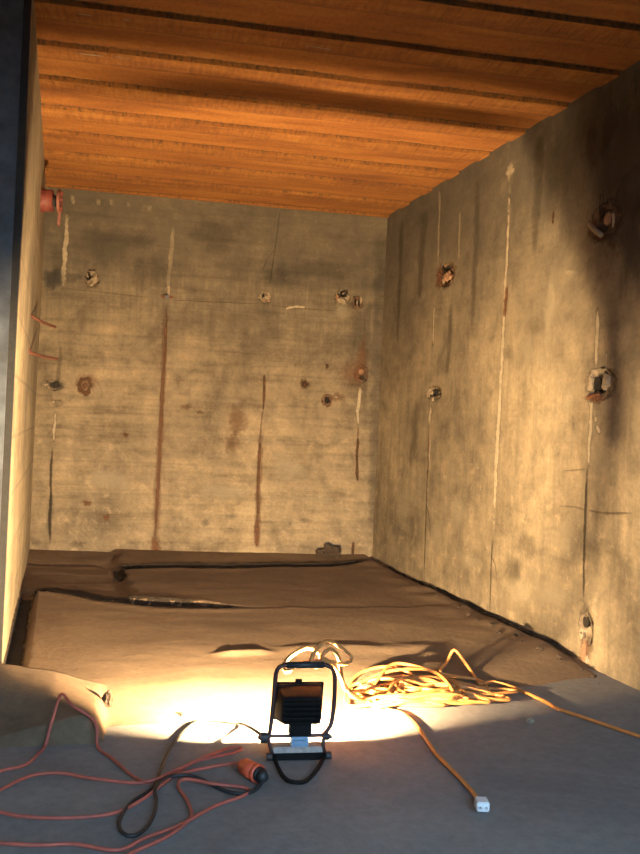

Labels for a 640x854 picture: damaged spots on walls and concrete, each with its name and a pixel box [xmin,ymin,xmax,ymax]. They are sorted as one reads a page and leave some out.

spalling [587,194,622,241]
water stain [45,218,69,289]
spalling [436,263,457,287]
spalling [335,289,363,310]
corrosion [77,377,92,396]
spalling [426,387,441,401]
water stain [493,198,510,525]
spalling [585,367,618,403]
corrosion [152,320,167,550]
crack [581,472,589,593]